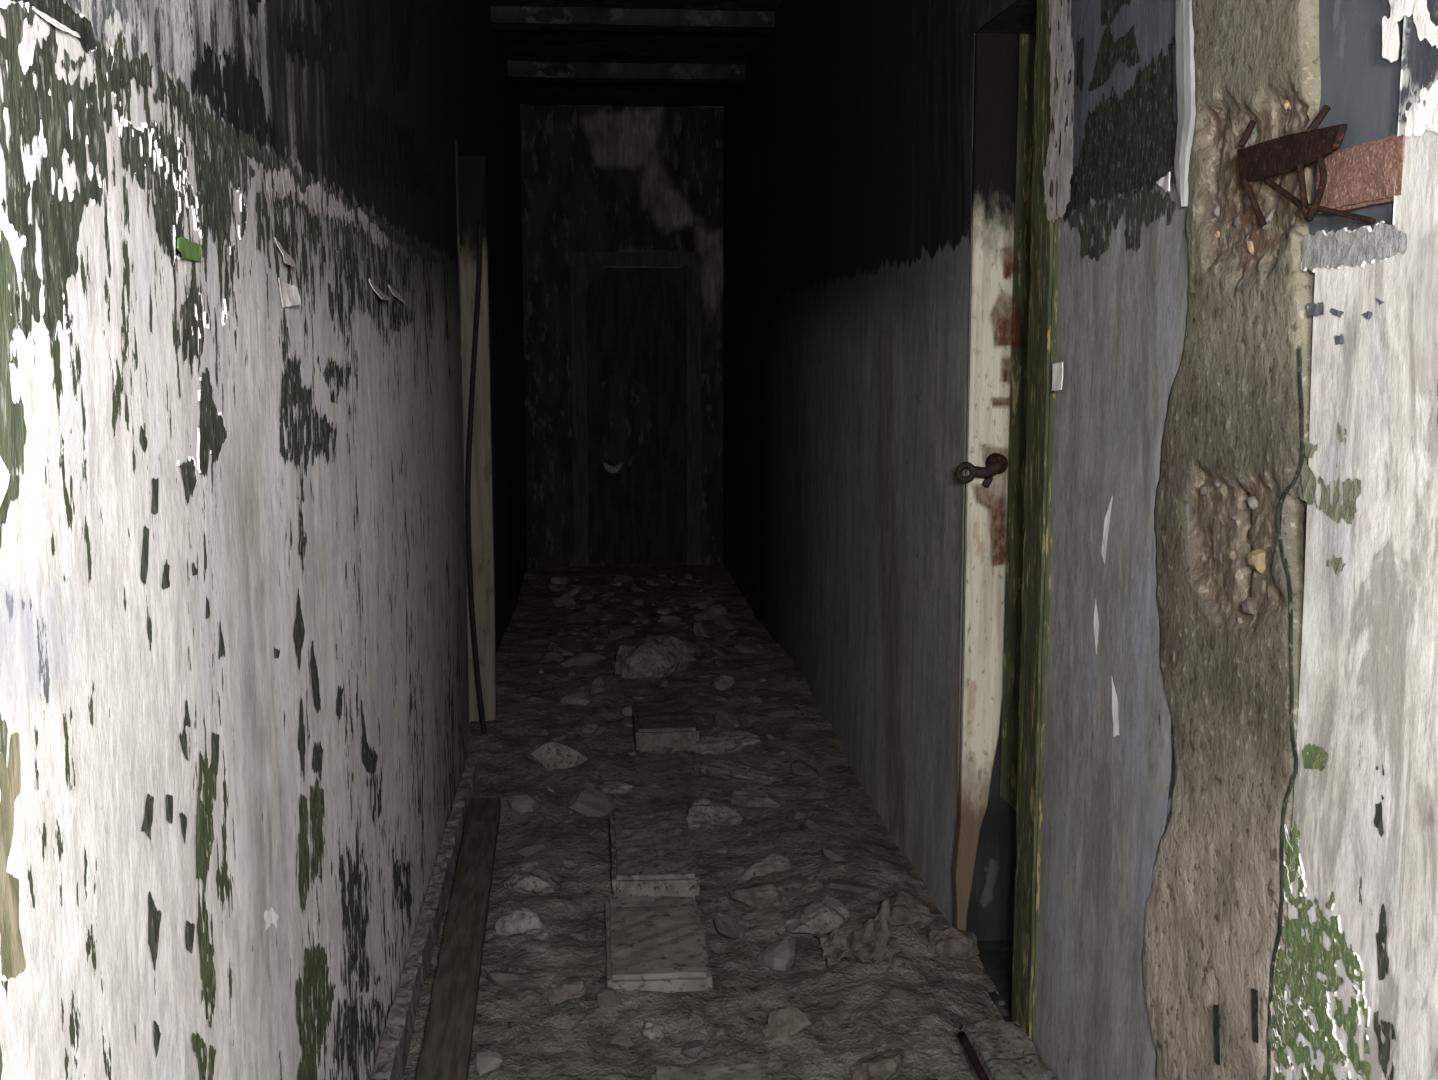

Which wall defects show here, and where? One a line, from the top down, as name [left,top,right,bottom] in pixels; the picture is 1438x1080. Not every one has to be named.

peeling [1382,0,1438,63]
peeling [1043,0,1176,261]
peeling [1405,80,1438,137]
peeling [0,0,449,571]
peeling [141,477,170,589]
peeling [206,596,225,660]
peeling [0,713,26,982]
peeling [142,699,219,1080]
peeling [274,588,384,1080]
peeling [1374,795,1384,837]
peeling [1376,904,1389,981]
peeling [1373,1011,1396,1080]